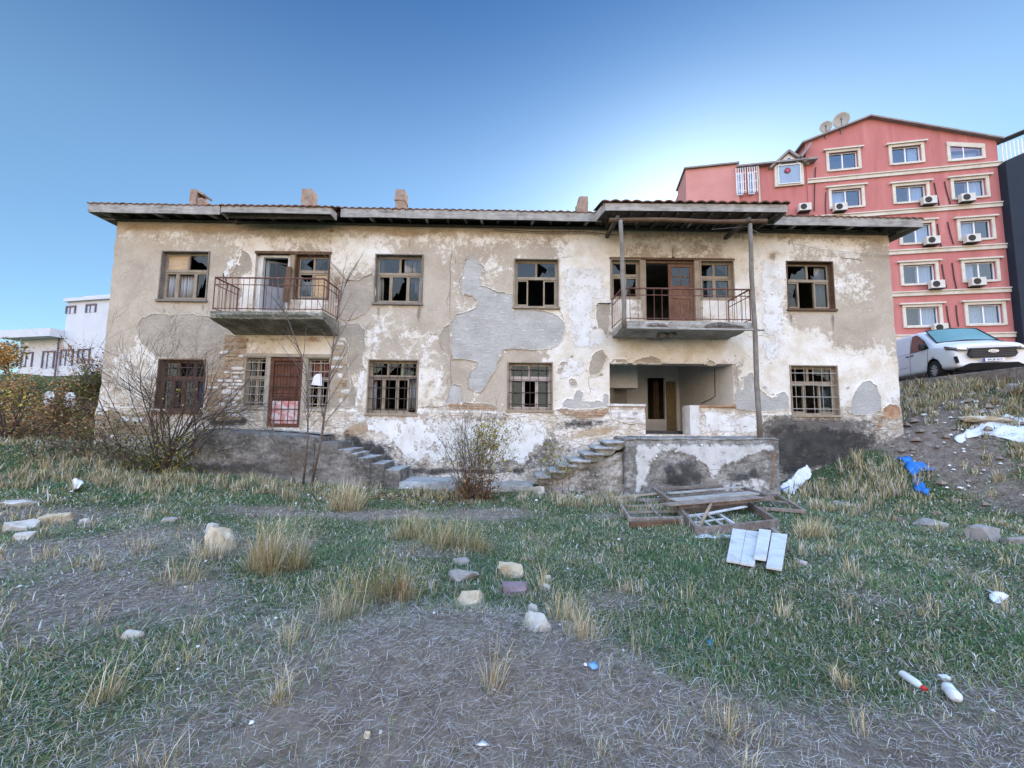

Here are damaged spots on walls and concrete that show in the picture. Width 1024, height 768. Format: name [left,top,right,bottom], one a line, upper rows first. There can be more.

spalling [136,312,248,422]
spalling [329,254,664,464]
damp [664,460,702,486]
peeling [635,260,790,493]
damp [771,425,876,473]
spalling [846,379,902,432]